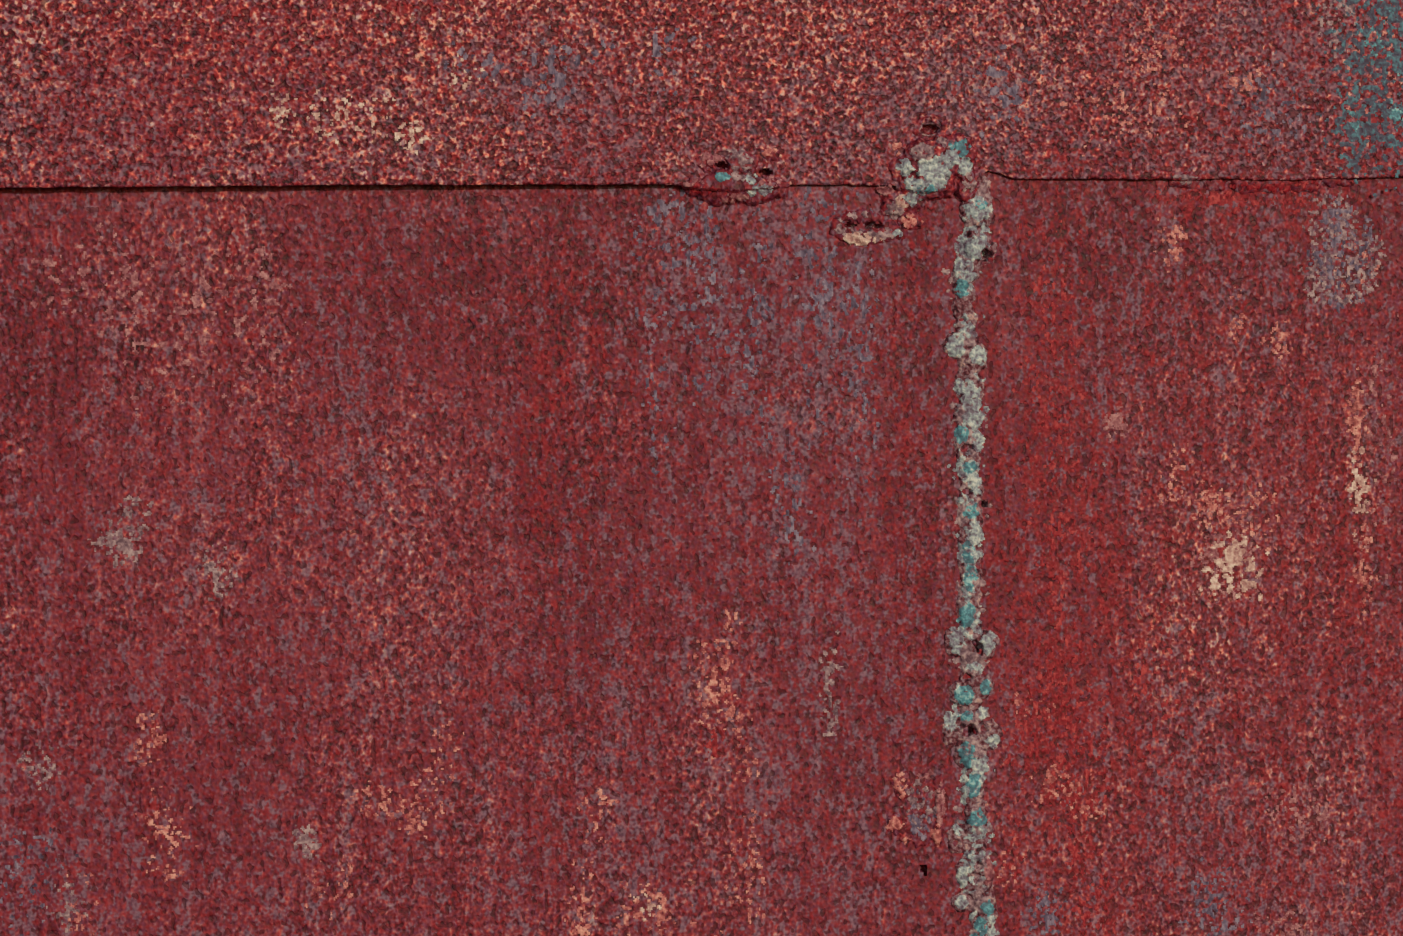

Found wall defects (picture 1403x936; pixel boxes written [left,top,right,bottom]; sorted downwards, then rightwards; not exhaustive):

corrosion [682,147,790,207]
corrosion [829,208,928,246]
corrosion [1155,185,1342,217]
corrosion [1343,344,1401,621]
peeling [877,136,1000,936]
corrosion [996,185,1200,936]
corrosion [133,710,167,766]
corrosion [688,609,760,782]
corrosion [135,786,199,882]
corrosion [885,768,949,876]
corrosion [63,901,99,936]